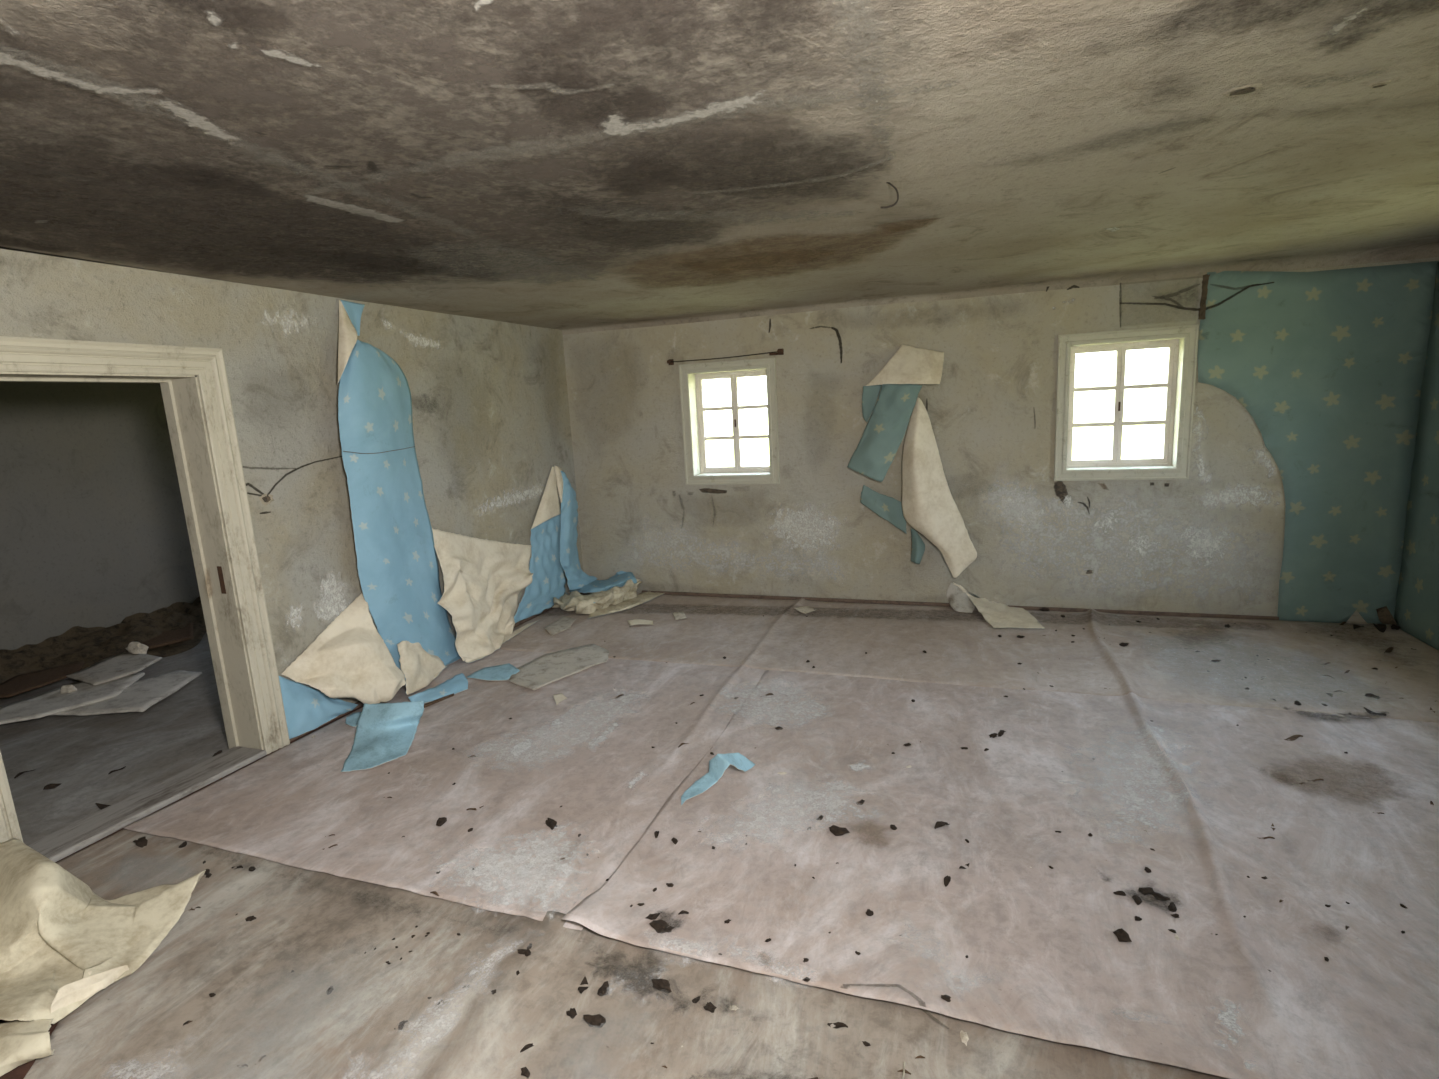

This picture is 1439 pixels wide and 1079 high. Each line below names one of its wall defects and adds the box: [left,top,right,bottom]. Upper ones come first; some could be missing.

leakage [1156,0,1439,46]
leakage [0,0,879,282]
peeling [279,574,468,739]